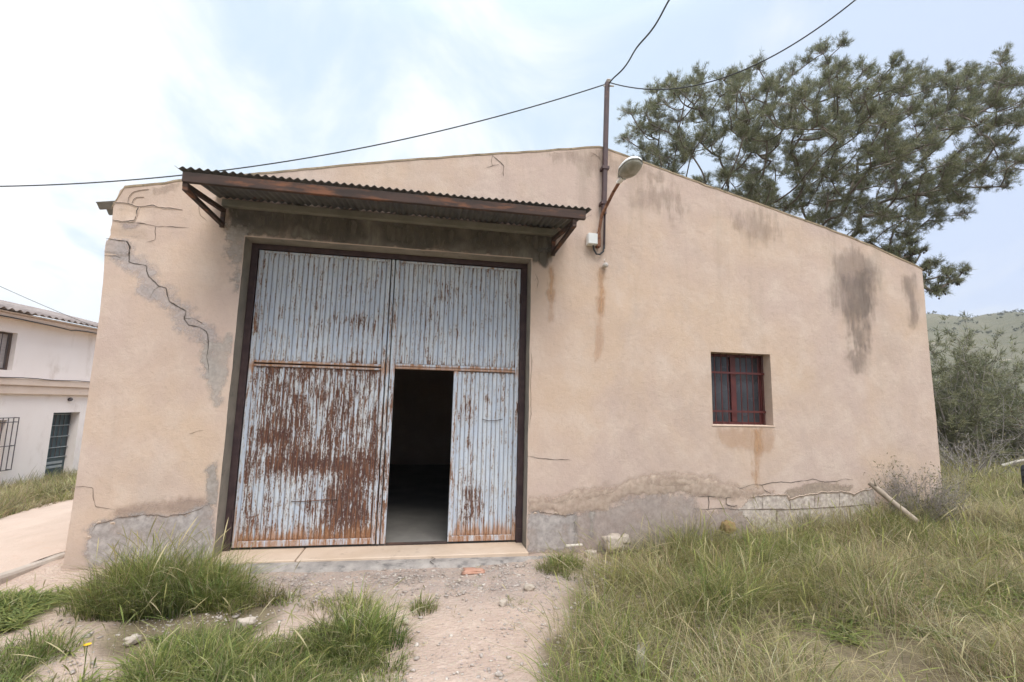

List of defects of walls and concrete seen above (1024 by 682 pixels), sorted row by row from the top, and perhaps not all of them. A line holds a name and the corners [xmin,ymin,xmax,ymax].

crack [104,189,209,373]
flaking render [84,505,214,567]
flaking render [739,482,875,533]